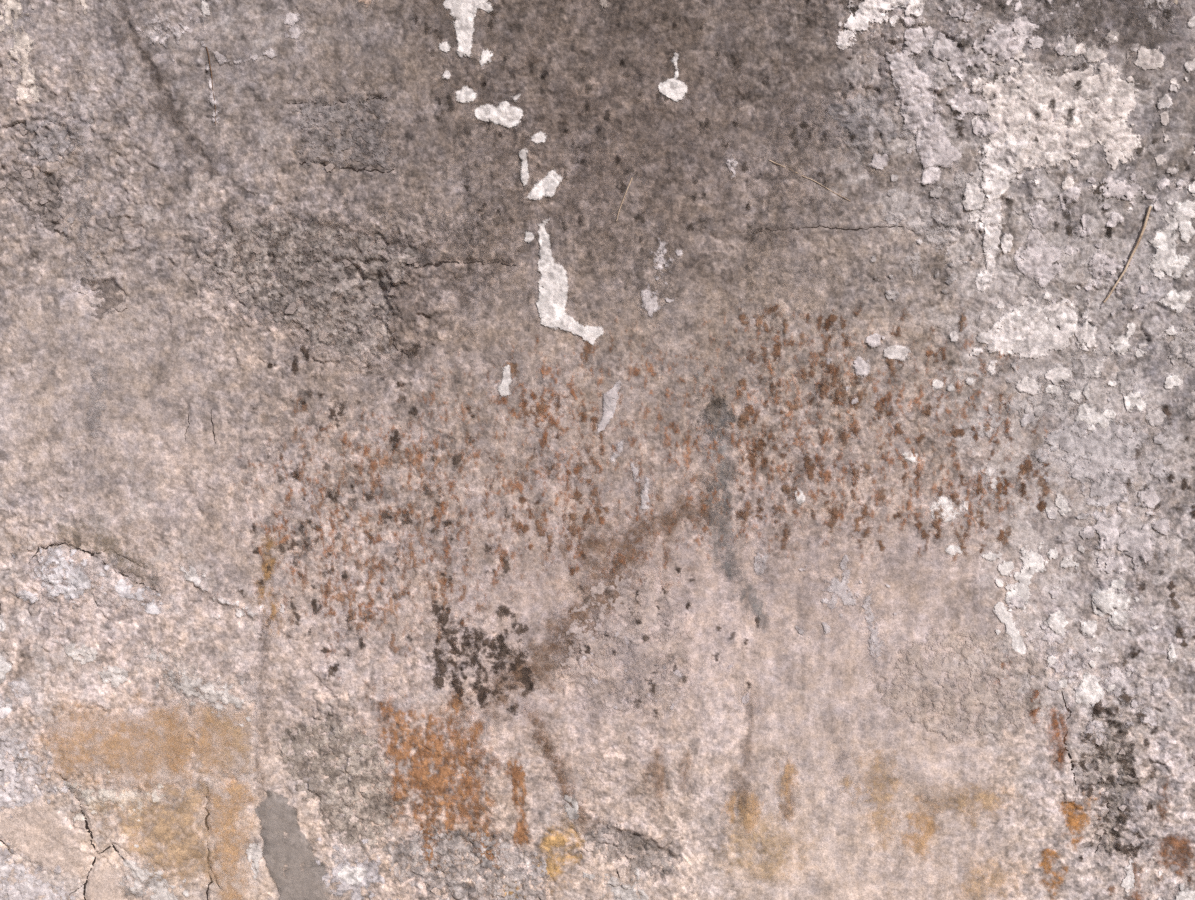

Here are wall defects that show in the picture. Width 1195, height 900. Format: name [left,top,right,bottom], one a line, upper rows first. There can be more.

water stain [14,524,163,615]
corrosion [256,366,593,652]
water stain [427,573,534,715]
corrosion [490,490,717,704]
corrosion [621,367,854,524]
water stain [705,304,903,574]
corrosion [874,370,981,418]
corrosion [872,423,1012,530]
water stain [916,424,1050,555]
water stain [993,602,1026,654]
water stain [0,735,166,823]
corrosion [379,693,585,878]